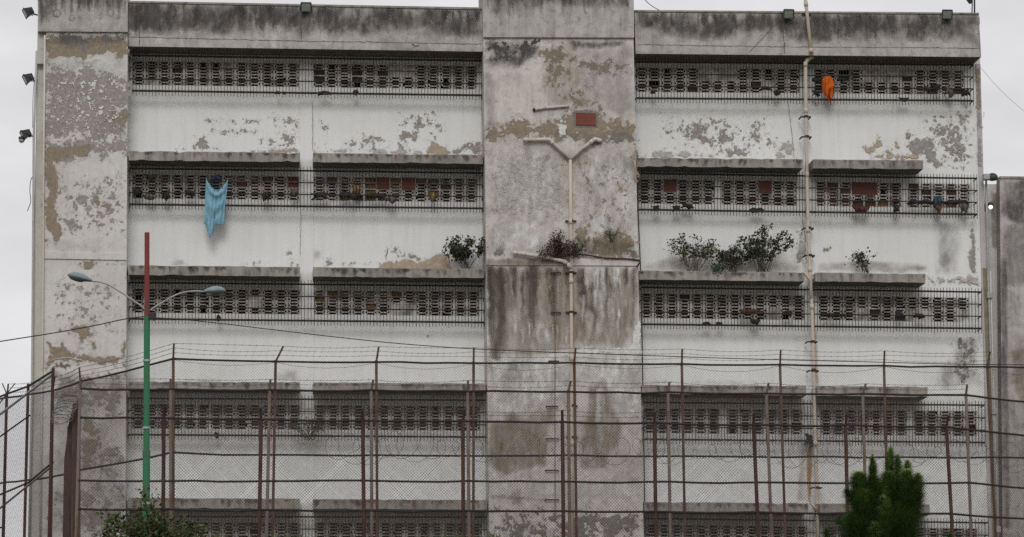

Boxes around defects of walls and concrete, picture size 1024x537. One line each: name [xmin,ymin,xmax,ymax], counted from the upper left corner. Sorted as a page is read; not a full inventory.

damp [114,4,478,35]
damp [641,14,894,40]
damp [907,21,926,39]
peeling [41,32,132,242]
flaking render [176,117,298,154]
peeling [345,133,385,151]
flaking render [395,45,640,259]
peeling [652,117,793,159]
peeling [862,68,983,168]
damp [487,150,643,474]
peeling [46,283,130,537]